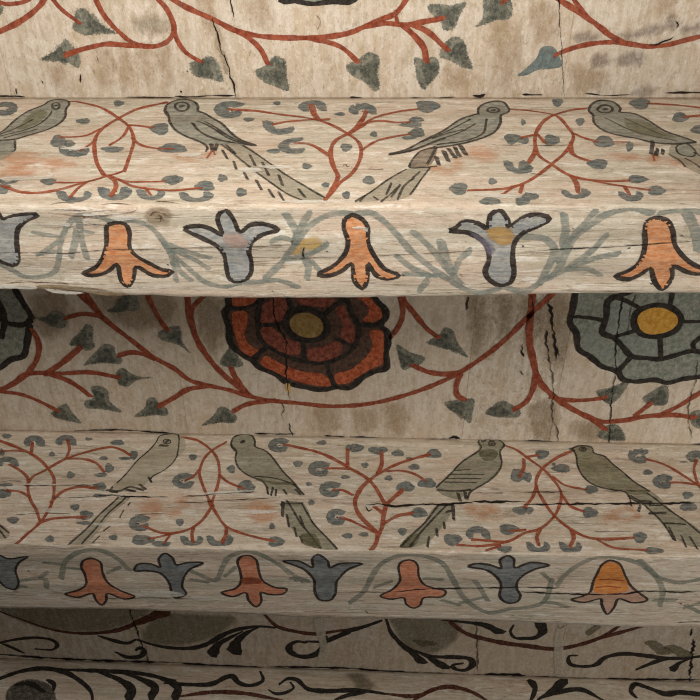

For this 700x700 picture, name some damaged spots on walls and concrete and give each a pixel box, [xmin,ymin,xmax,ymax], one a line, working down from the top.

crack [140,18,236,98]
crack [667,88,700,96]
crack [255,298,293,436]
crack [528,297,559,442]
crack [608,295,636,442]
crack [77,427,168,435]
crack [364,490,695,512]
crack [0,597,426,673]
crack [474,620,549,677]
crack [594,621,700,682]